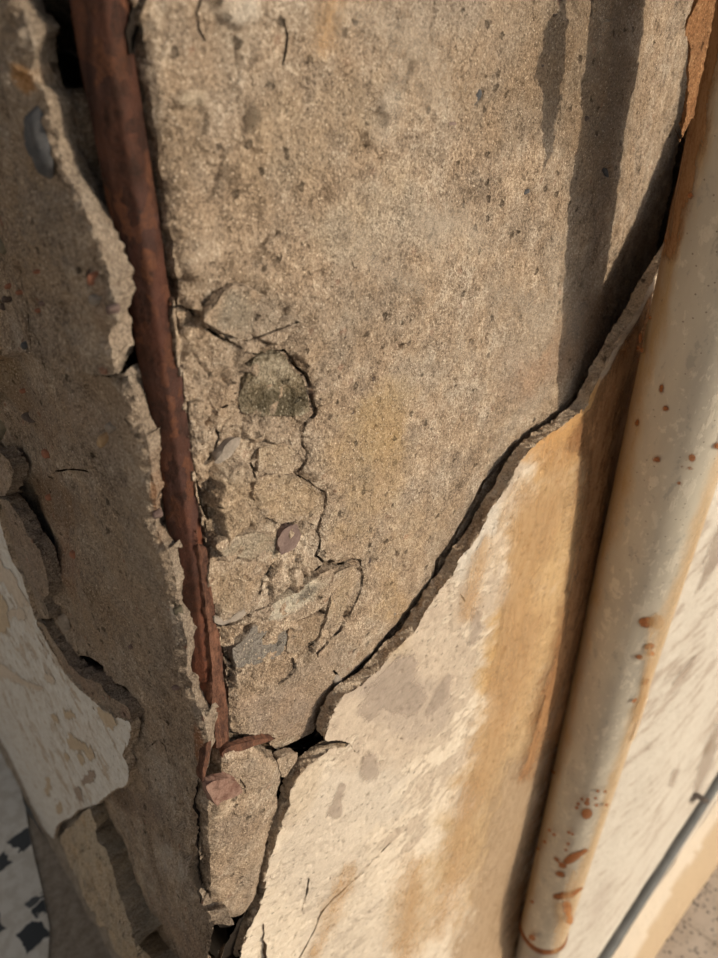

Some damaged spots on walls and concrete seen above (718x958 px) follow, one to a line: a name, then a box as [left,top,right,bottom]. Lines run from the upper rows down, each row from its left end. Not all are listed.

crack [126,0,141,54]
crack [169,305,325,492]
spalling [0,0,242,958]
rust [507,294,652,948]
rust [639,617,655,628]
crack [273,732,348,802]
crack [193,778,203,903]
water stain [452,752,544,958]
crack [218,908,248,958]